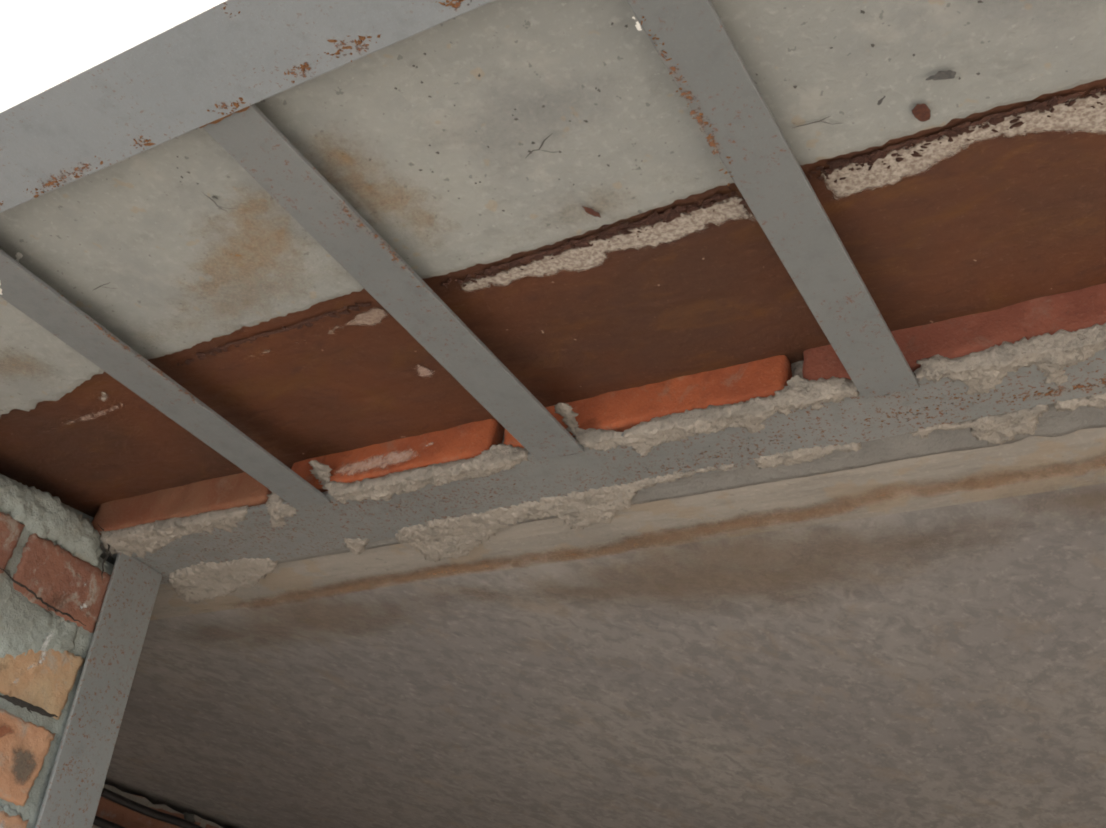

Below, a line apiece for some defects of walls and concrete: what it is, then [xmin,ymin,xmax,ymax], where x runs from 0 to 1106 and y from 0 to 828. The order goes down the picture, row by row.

rust [438,0,472,10]
rust [207,97,245,115]
rust [641,16,733,186]
flaking render [808,87,1106,199]
rust [23,156,111,198]
flaking render [448,187,756,291]
flaking render [329,308,387,334]
crack [0,568,86,626]